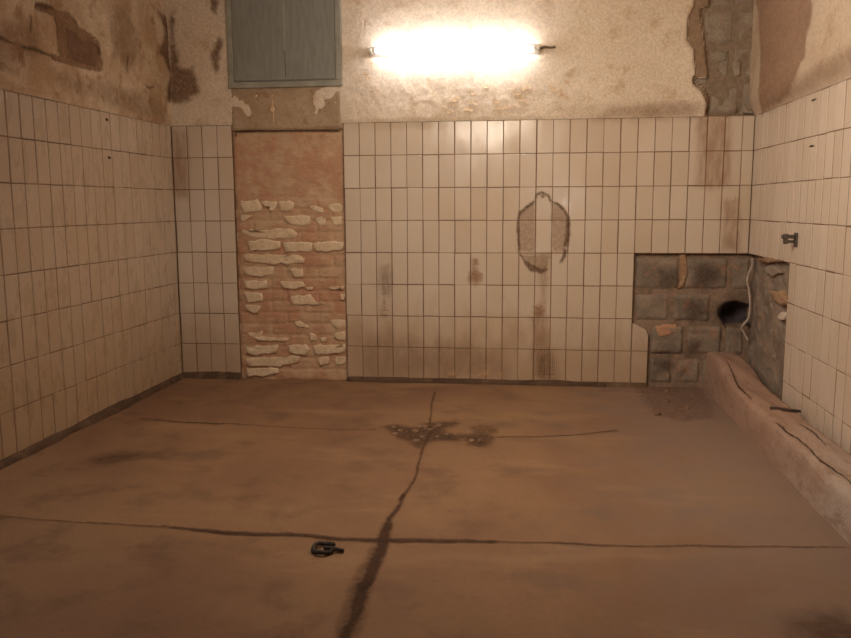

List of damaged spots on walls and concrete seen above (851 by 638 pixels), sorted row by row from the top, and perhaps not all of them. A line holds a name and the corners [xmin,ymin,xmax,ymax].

spalling [23,3,102,71]
spalling [687,0,756,117]
peeling [240,199,344,314]
peeling [246,319,346,377]
spalling [632,253,789,399]
crack [776,422,851,484]
crack [0,394,640,638]